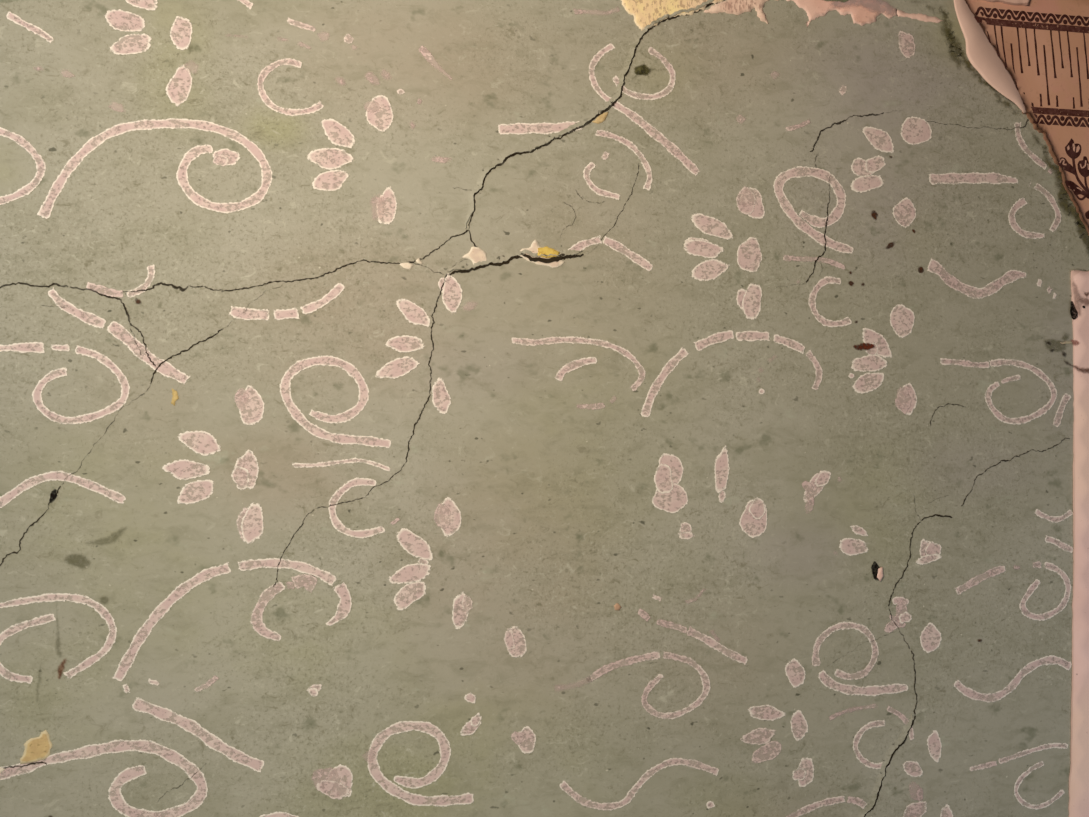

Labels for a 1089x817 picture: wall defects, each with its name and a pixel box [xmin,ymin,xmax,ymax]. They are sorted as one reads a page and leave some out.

spalling [621,0,778,30]
peeling [954,0,1026,113]
crack [0,0,725,587]
crack [856,438,1069,817]
crack [3,761,47,769]